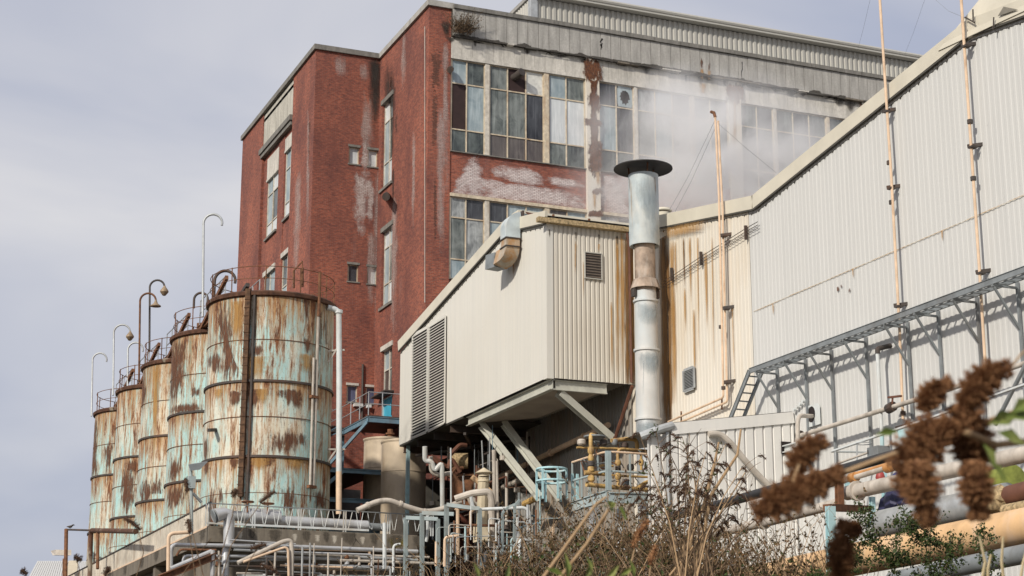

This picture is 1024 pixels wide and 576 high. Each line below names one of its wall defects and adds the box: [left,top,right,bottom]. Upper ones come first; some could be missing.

corrosion [583,58,604,217]
efflorescence [355,176,378,228]
efflorescence [454,162,586,207]
corrosion [659,224,713,423]
corrosion [141,331,202,423]
corrosion [207,300,302,408]
corrosion [302,338,312,370]
corrosion [91,425,113,480]
corrosion [253,431,306,468]
corrosion [120,457,187,514]
corrosion [209,488,223,526]
corrosion [281,487,296,511]